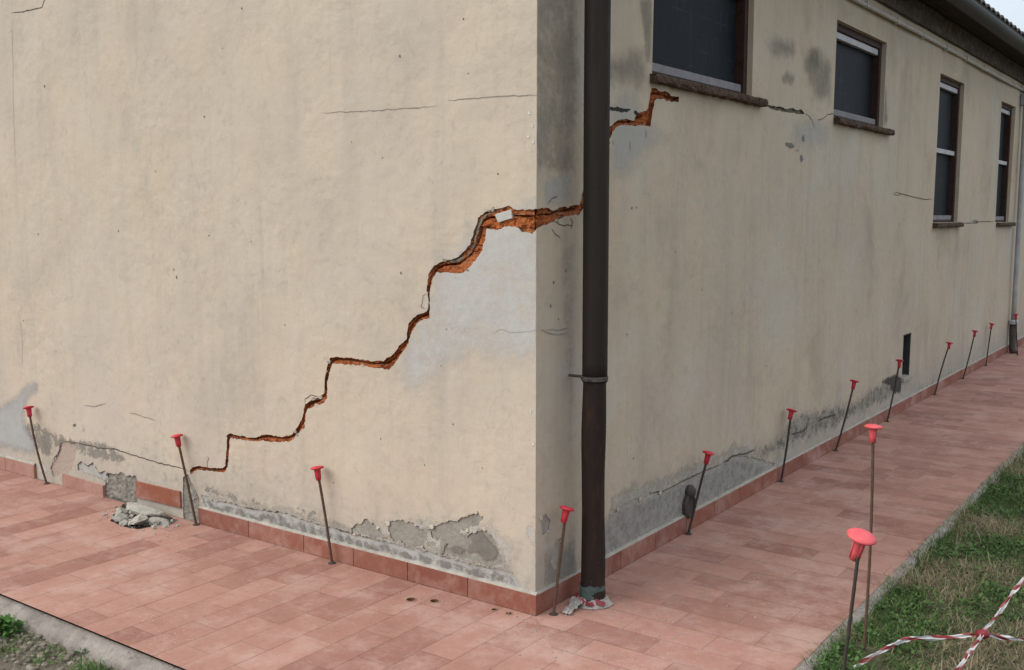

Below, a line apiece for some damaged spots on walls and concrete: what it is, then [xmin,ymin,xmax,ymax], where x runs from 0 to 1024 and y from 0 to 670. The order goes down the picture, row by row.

crack [331,95,534,113]
crack [610,88,676,145]
crack [53,193,583,473]
leakage [768,374,901,450]
flaking render [78,461,153,529]
flaking render [165,475,521,587]